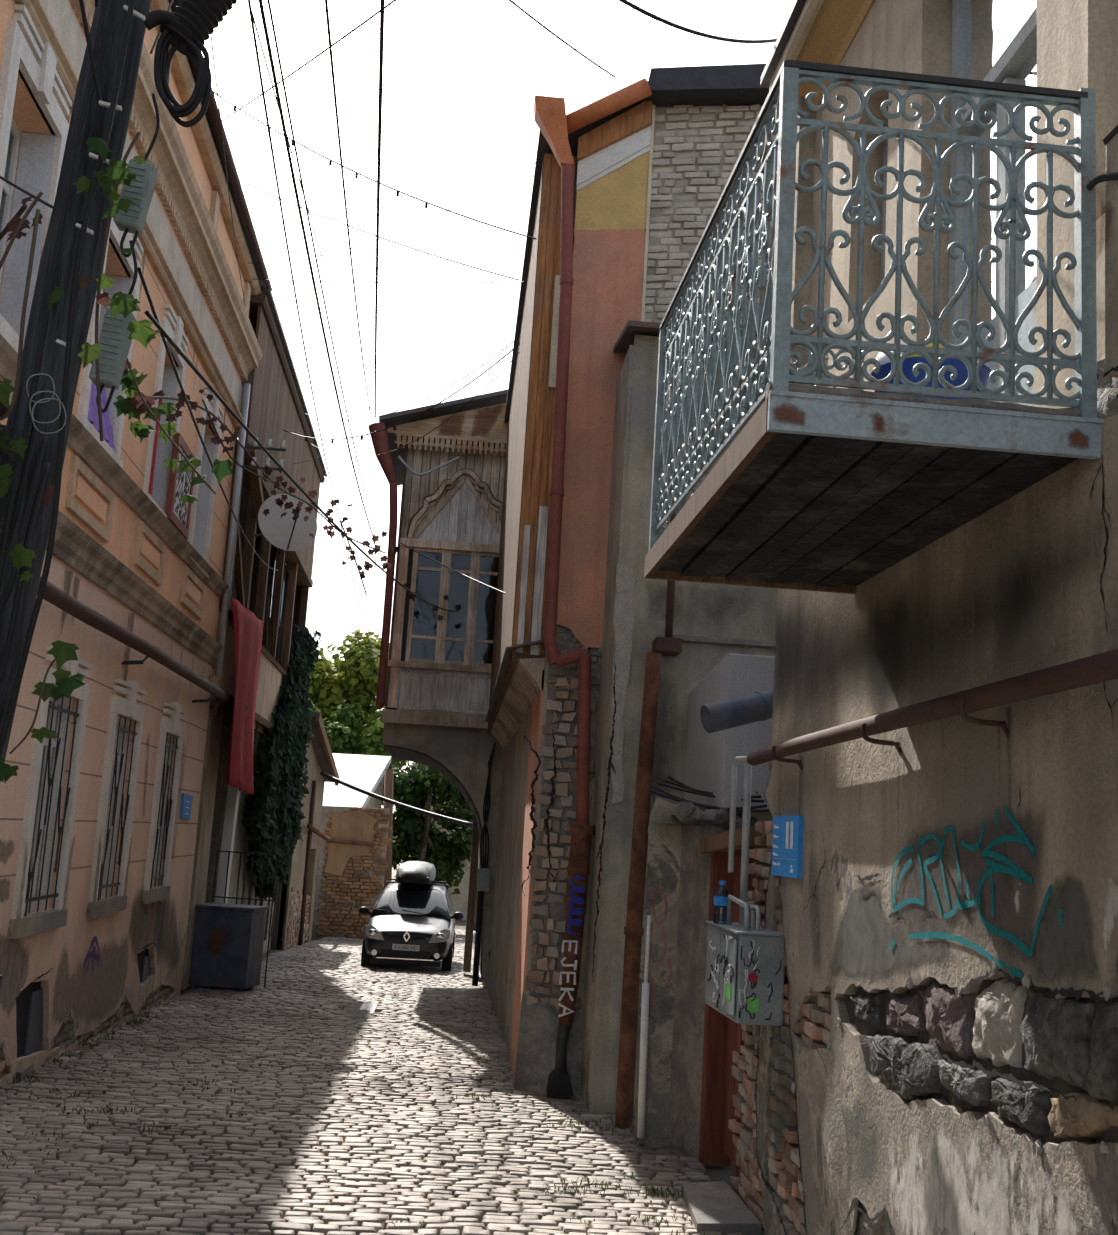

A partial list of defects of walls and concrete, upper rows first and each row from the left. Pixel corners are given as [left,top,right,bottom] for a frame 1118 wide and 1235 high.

corrosion [775,405,804,425]
corrosion [874,414,884,431]
corrosion [1069,429,1088,448]
flaking render [1097,359,1118,436]
crack [1090,455,1110,629]
water stain [775,611,980,707]
water stain [54,838,179,1020]
flaking render [789,873,1118,1228]
flaking render [828,1201,896,1235]
water stain [889,1128,1076,1235]